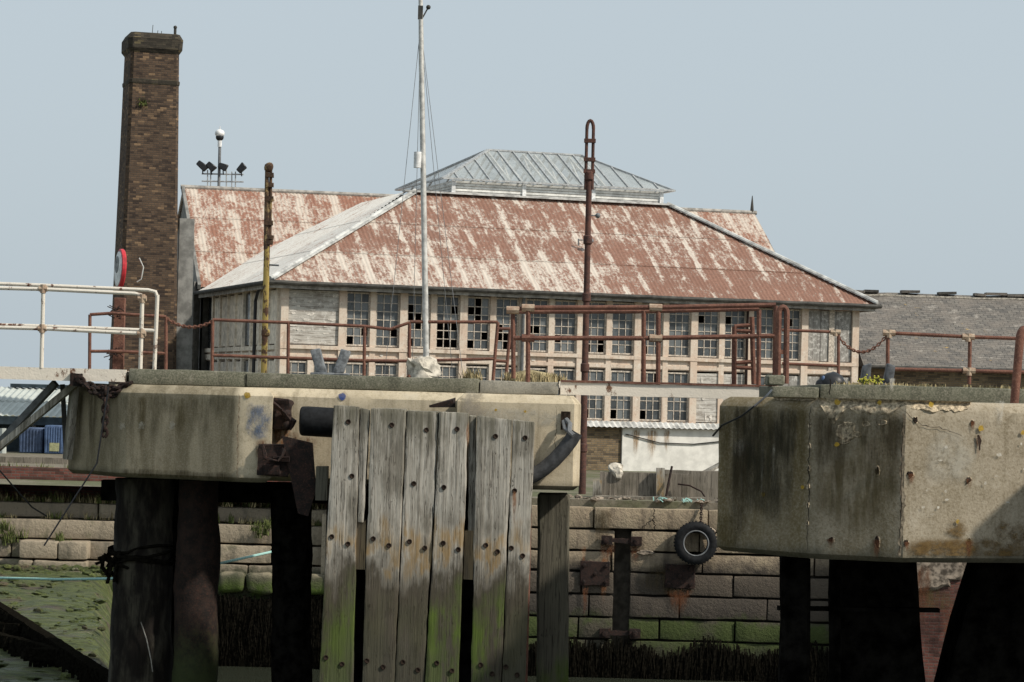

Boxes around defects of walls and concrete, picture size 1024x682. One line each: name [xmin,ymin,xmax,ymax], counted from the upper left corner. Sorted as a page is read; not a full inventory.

leakage [721,409,804,521]
crack [806,379,831,549]
spalling [773,397,974,445]